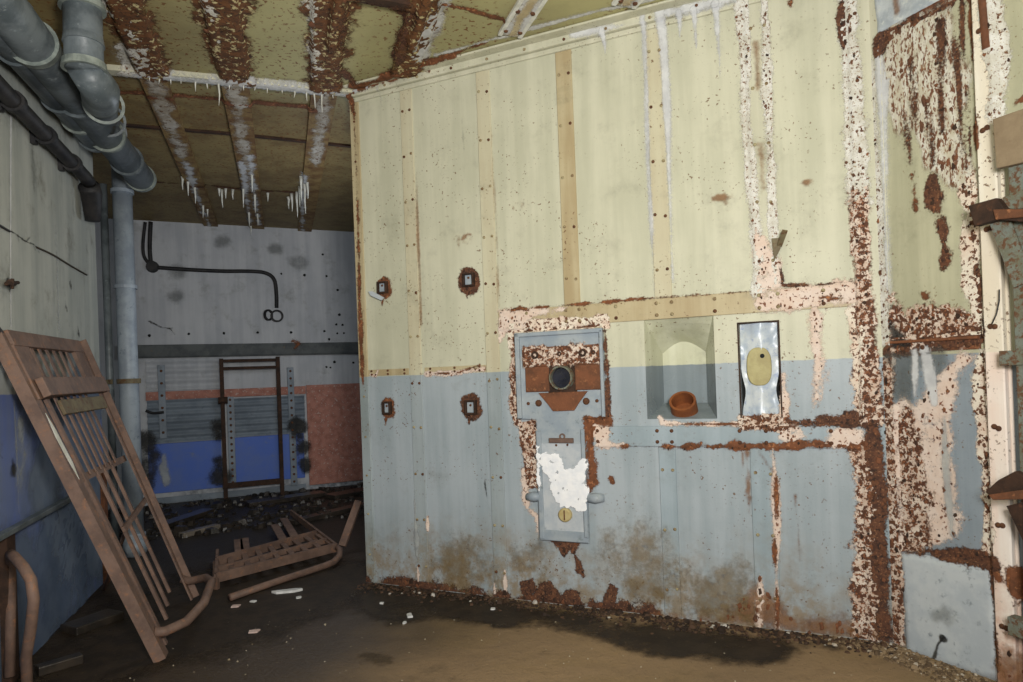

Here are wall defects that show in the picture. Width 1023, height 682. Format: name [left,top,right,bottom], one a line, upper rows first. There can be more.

rust [103,0,318,113]
water stain [132,71,368,107]
rust [297,0,506,138]
water stain [412,0,734,244]
rust [873,0,974,65]
peeling [977,0,1012,123]
water stain [217,155,269,232]
water stain [286,172,309,231]
rust [910,173,953,271]
peeling [733,0,996,646]
peeling [498,305,610,532]
rust [661,394,1023,682]